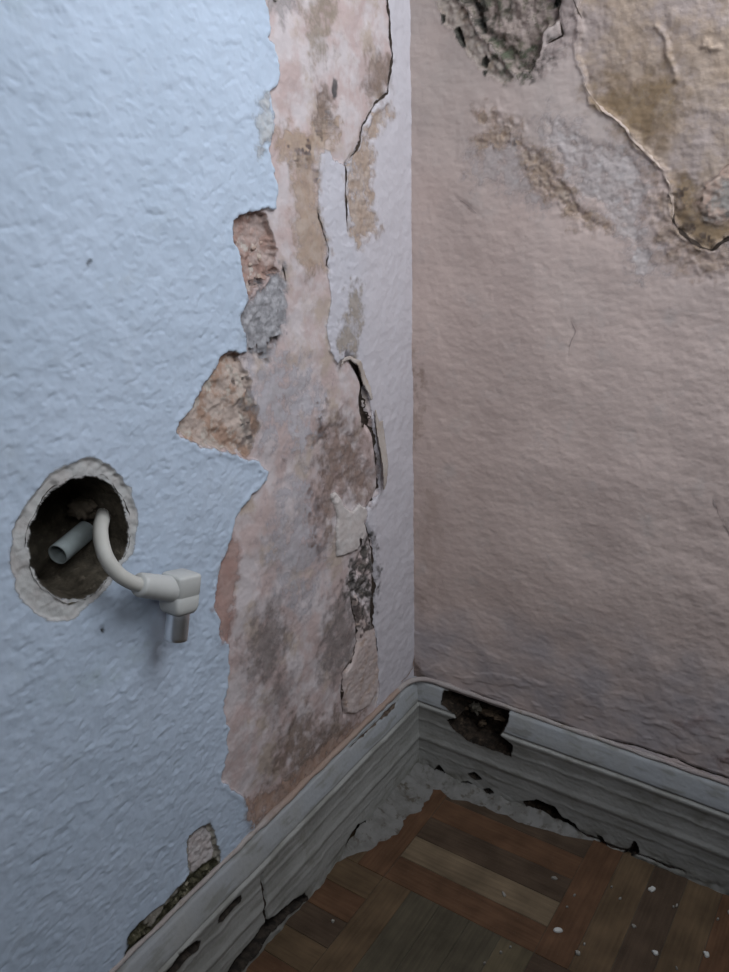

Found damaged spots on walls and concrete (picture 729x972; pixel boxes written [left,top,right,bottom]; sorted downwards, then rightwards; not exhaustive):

damp [437,0,513,82]
crack [318,0,393,268]
peeling [460,0,729,251]
spalling [233,211,279,298]
spalling [176,352,260,457]
damp [241,268,382,682]
crack [341,355,379,711]
damp [272,712,345,781]
spalling [441,690,513,756]
spalling [125,823,221,962]
crack [218,876,266,923]
crack [167,941,201,972]